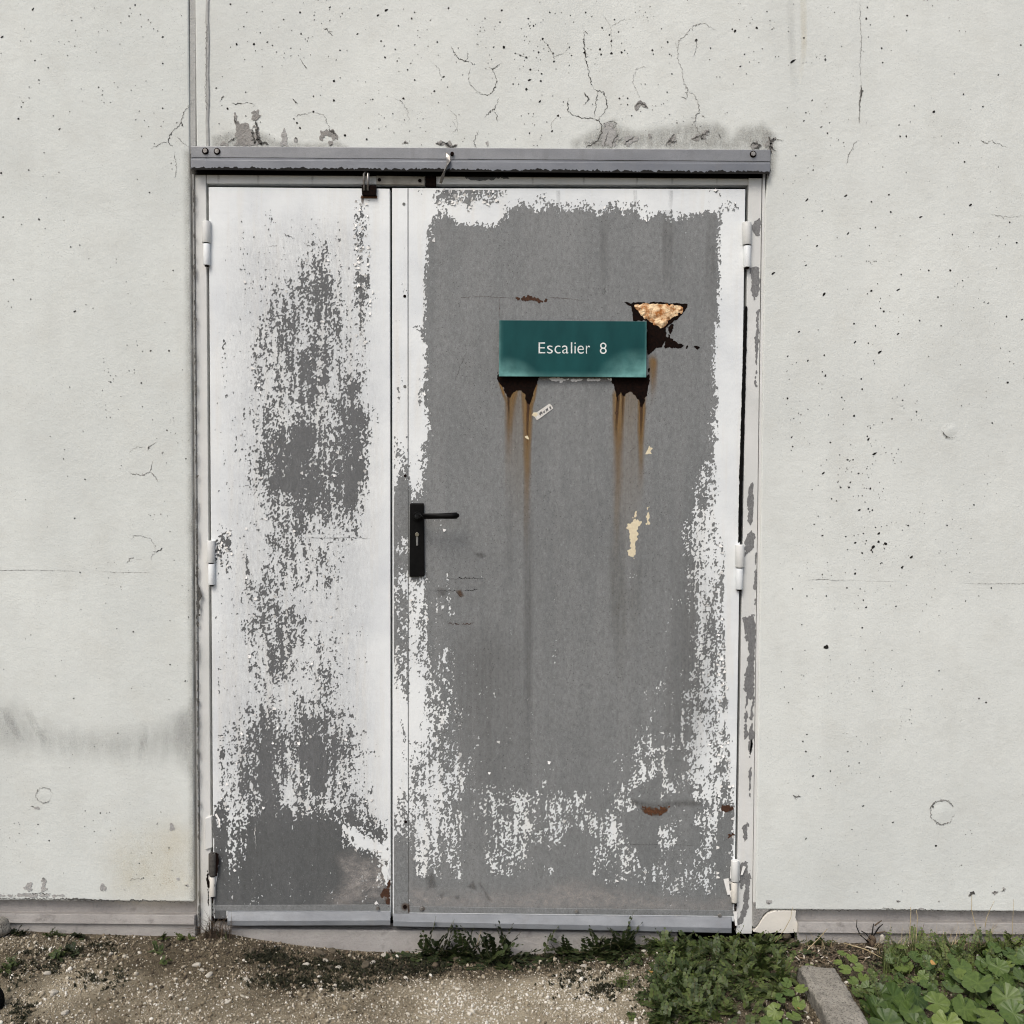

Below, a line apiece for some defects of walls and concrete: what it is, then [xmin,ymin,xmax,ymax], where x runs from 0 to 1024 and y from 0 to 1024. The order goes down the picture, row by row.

spalling [215,76,301,147]
crack [430,46,525,147]
crack [548,18,624,146]
crack [675,23,712,145]
crack [847,5,864,162]
rust [497,372,539,471]
rust [611,302,688,454]
peeling [0,188,1020,927]